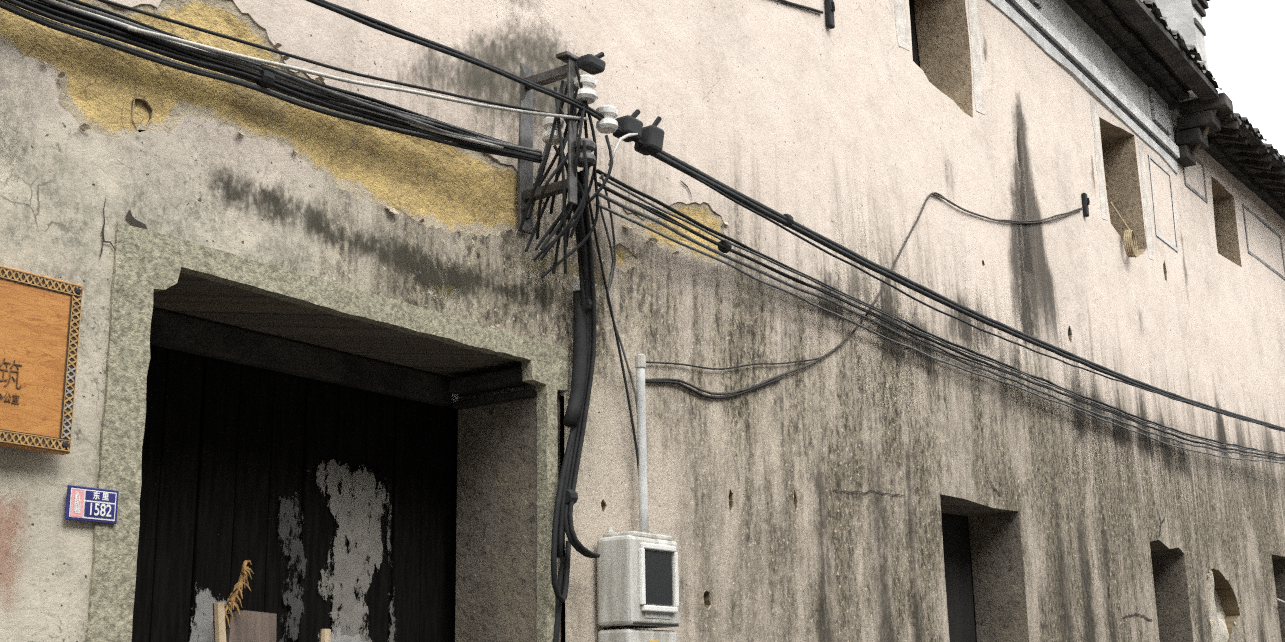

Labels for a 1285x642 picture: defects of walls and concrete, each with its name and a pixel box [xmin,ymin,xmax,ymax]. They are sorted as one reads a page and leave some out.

spalling [0,0,545,237]
spalling [612,243,638,272]
spalling [619,202,729,263]
damp [1001,103,1058,412]
damp [821,268,935,376]
damp [949,296,991,349]
damp [819,554,832,642]
damp [874,469,893,642]
damp [914,594,922,642]
damp [1059,520,1116,642]